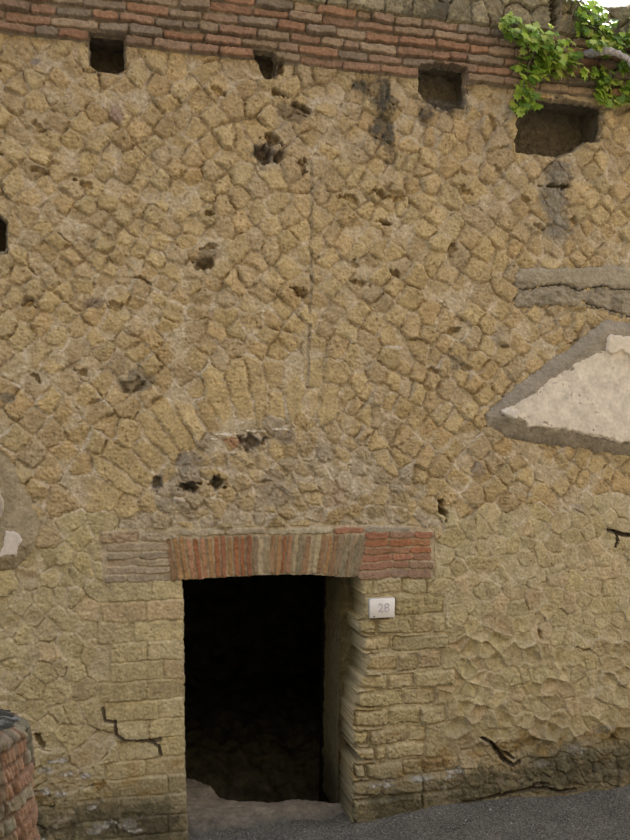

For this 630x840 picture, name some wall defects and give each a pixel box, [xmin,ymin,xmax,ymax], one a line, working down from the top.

crack [101,706,163,756]
crack [480,736,521,767]